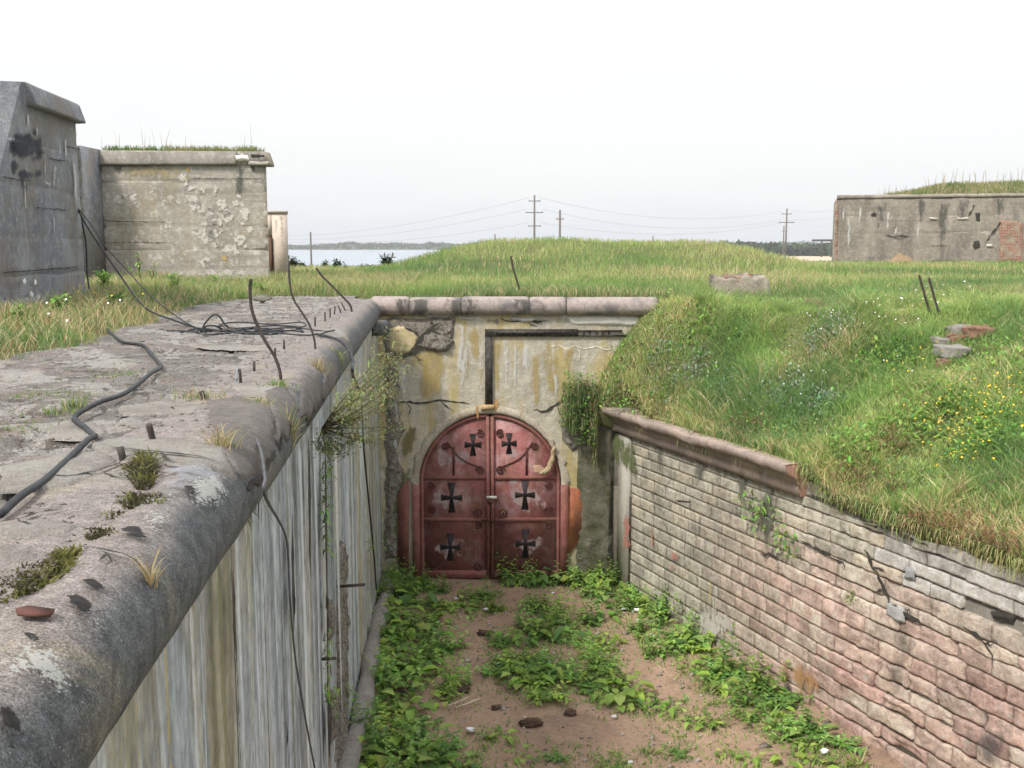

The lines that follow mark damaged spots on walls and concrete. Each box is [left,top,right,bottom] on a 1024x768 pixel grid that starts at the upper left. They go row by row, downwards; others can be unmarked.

water stain [939,202,968,245]
spalling [973,220,1023,262]
water stain [448,299,475,384]
crack [399,399,468,414]
water stain [393,427,416,456]
spalling [382,315,475,559]
crack [760,494,929,625]
spalling [990,611,1016,623]